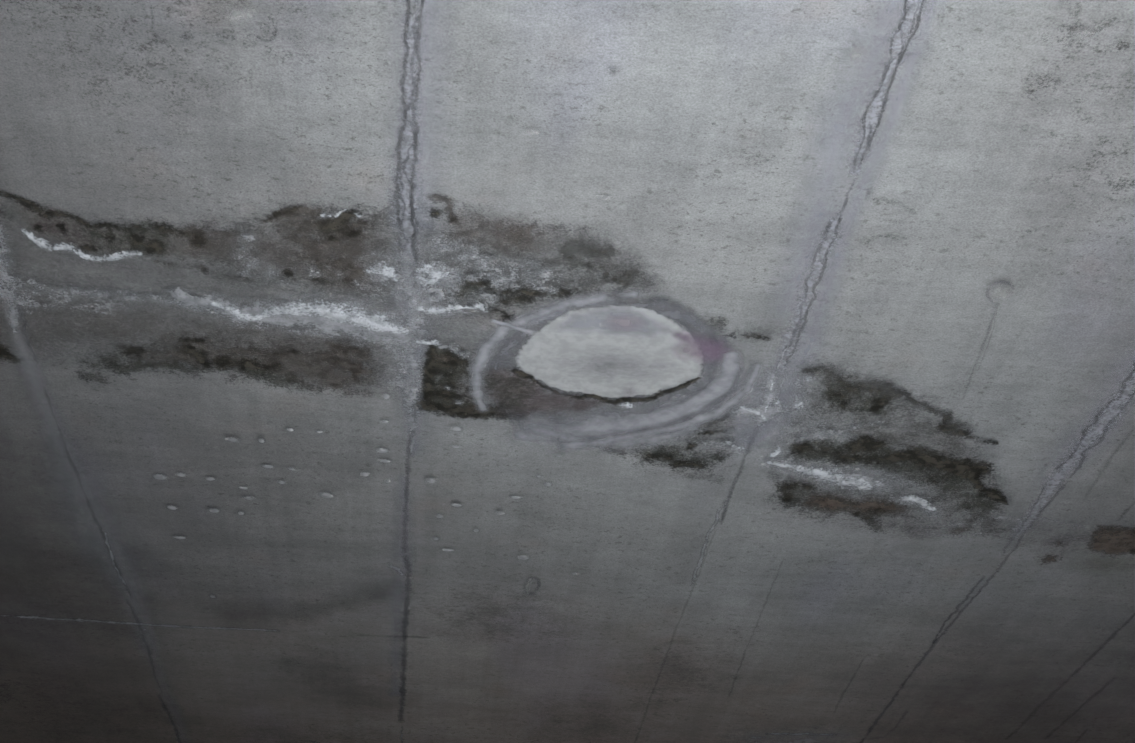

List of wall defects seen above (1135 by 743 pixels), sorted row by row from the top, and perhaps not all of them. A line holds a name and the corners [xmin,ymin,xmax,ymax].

crack [849,0,924,175]
crack [0,222,20,333]
damp [0,191,645,433]
crack [390,0,424,457]
damp [704,318,770,341]
crack [761,214,841,406]
damp [599,366,1008,532]
crack [1010,365,1135,540]
rust [1088,526,1135,557]